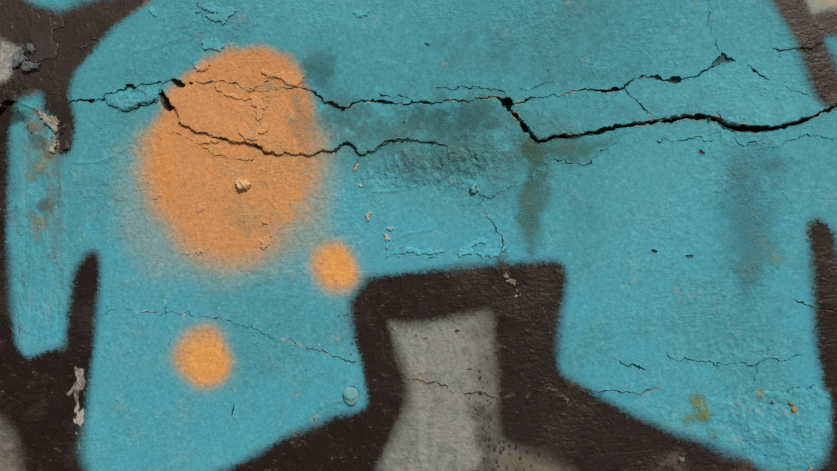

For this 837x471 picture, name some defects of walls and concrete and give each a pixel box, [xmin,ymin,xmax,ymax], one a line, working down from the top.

peeling [12,6,65,72]
peeling [195,2,237,25]
crack [0,98,38,136]
spalling [38,111,73,153]
peeling [214,83,269,141]
crack [68,79,449,173]
crack [194,0,837,256]
crack [98,300,362,366]
crack [381,350,806,419]